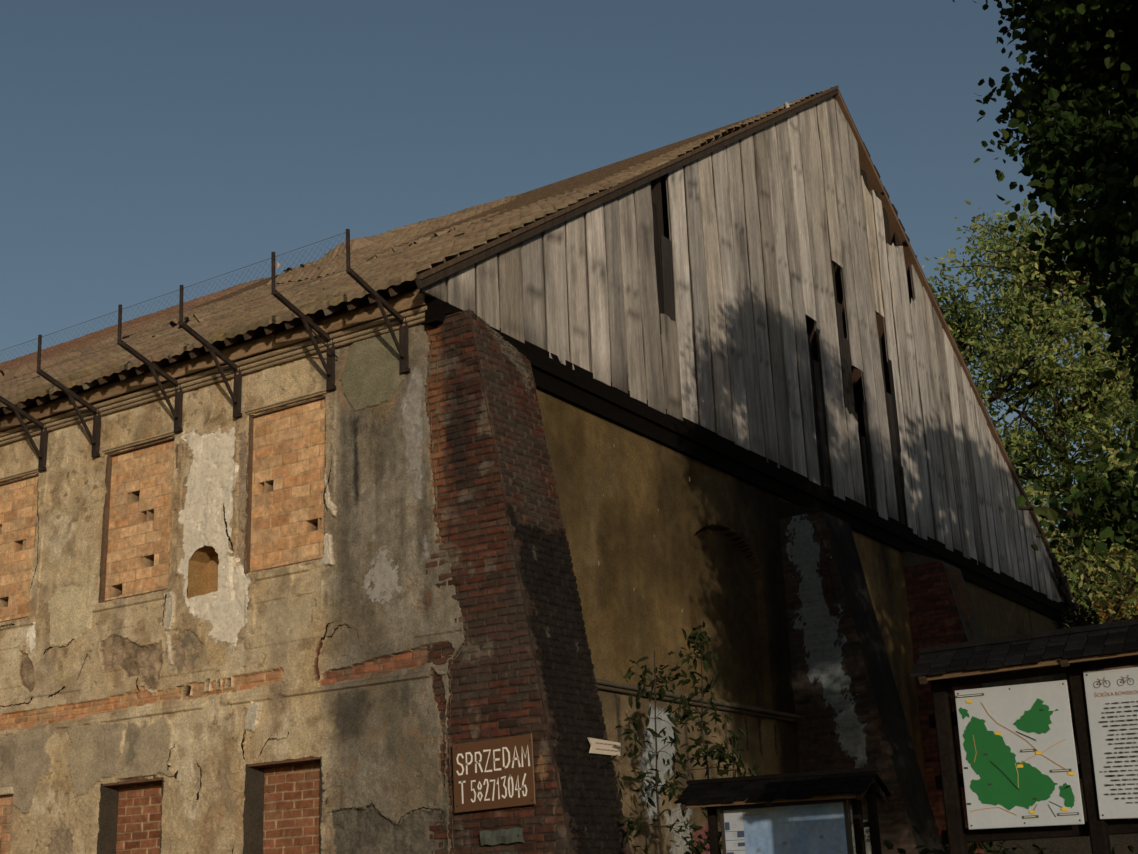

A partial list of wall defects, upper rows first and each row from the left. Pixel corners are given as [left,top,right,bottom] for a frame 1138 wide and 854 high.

spalling [228,430,249,567]
peeling [361,546,405,605]
flaking render [317,640,455,687]
peeling [785,514,867,768]
flaking render [0,590,284,814]
spalling [45,823,73,854]
crack [328,802,440,826]